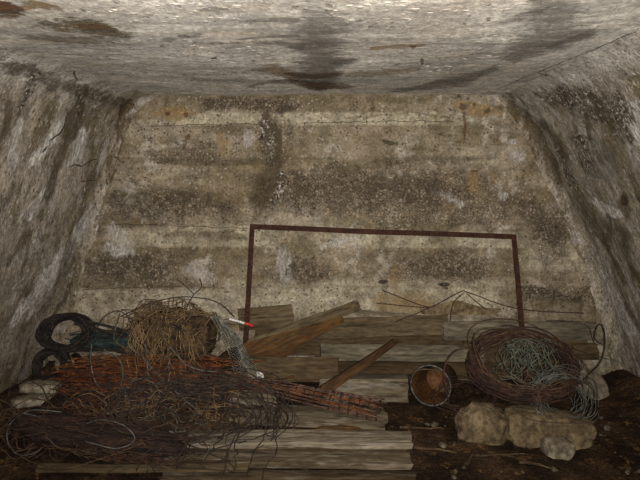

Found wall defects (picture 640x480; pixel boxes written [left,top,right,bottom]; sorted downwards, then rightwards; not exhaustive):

water stain [240,7,354,90]
water stain [508,0,595,61]
water stain [627,100,640,146]